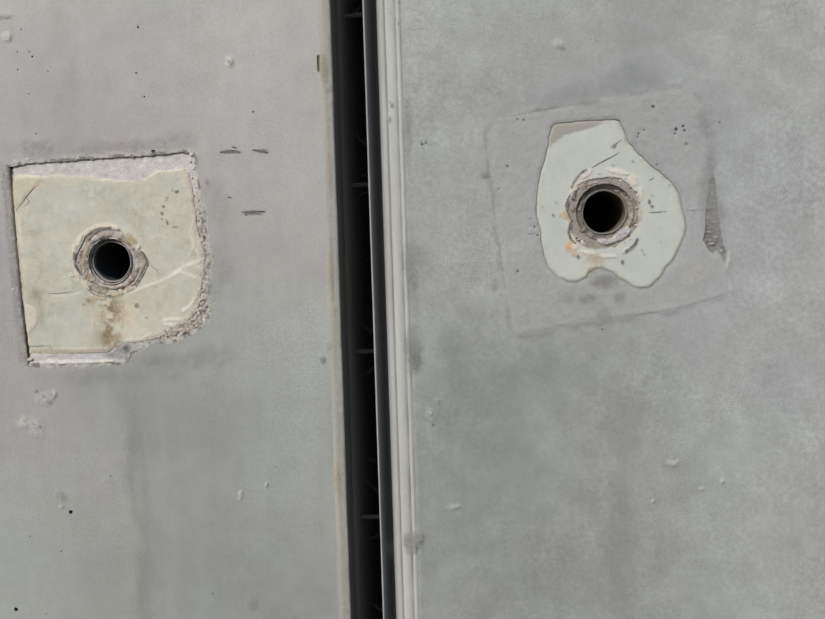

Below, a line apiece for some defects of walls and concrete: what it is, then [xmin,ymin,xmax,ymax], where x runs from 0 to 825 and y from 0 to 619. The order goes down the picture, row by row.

spalling [0,148,215,369]
peeling [703,173,727,264]
corrosion [100,297,121,346]